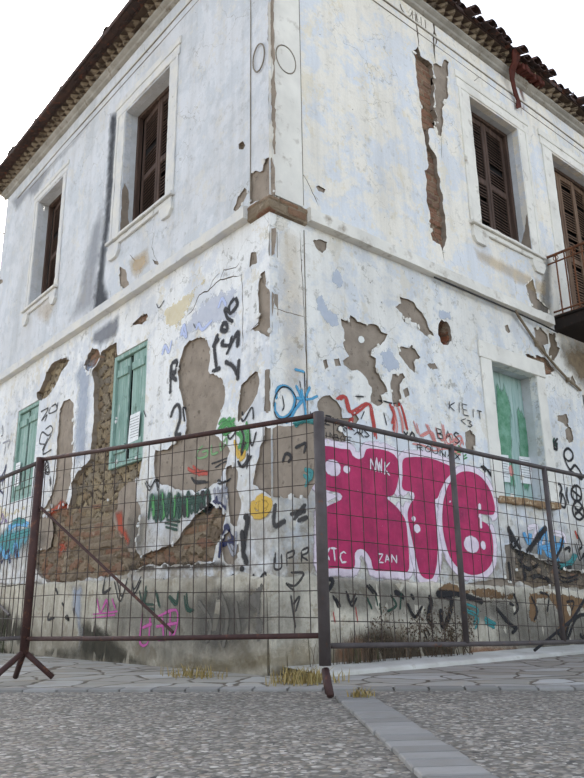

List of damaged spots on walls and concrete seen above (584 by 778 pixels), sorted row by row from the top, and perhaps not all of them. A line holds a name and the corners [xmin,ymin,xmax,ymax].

flaking render [412,50,447,253]
damp [95,115,116,308]
spalling [428,310,451,345]
peeling [376,343,401,376]
flaking render [526,351,554,377]
flaking render [37,346,226,583]
damp [51,626,136,663]